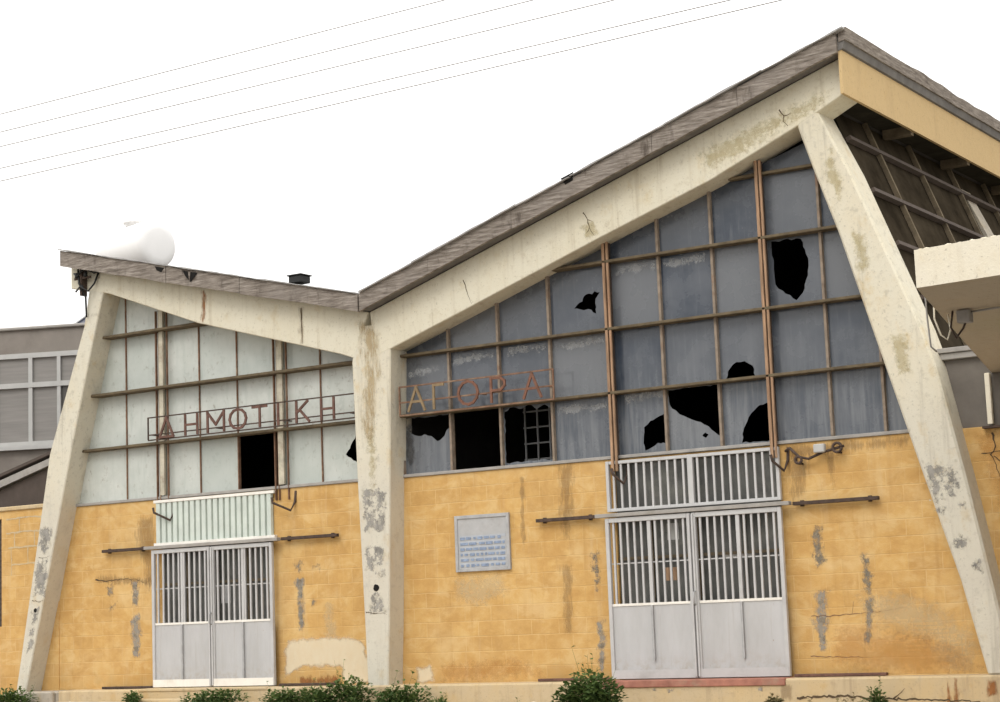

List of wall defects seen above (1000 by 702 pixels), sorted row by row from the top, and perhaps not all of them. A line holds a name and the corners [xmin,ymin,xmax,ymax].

crack [981,432,1000,477]
peeling [361,488,386,533]
peeling [922,459,966,514]
peeling [26,526,52,652]
peeling [365,547,386,613]
leakage [284,637,368,684]